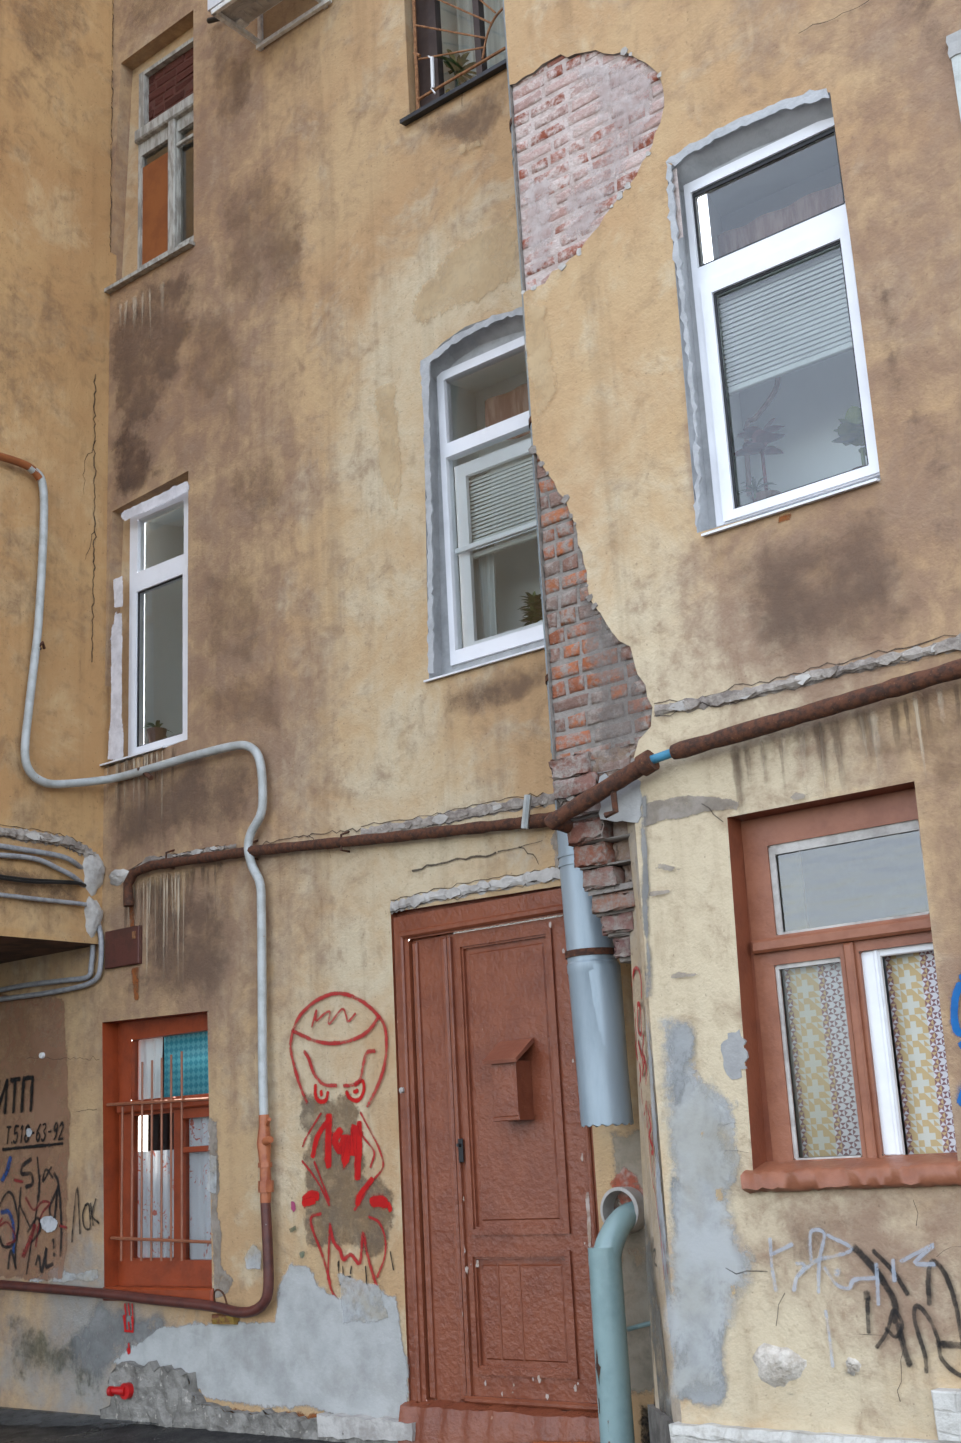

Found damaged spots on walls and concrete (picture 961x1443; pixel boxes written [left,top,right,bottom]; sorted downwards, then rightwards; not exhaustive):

crack [798,0,869,34]
spalling [513,46,664,413]
spalling [672,168,683,239]
damp [113,275,187,491]
crack [83,374,97,662]
damp [857,691,956,745]
damp [733,746,763,785]
crack [412,840,543,872]
damp [125,868,218,987]
spalling [361,445,961,1397]
spalling [100,1360,416,1443]